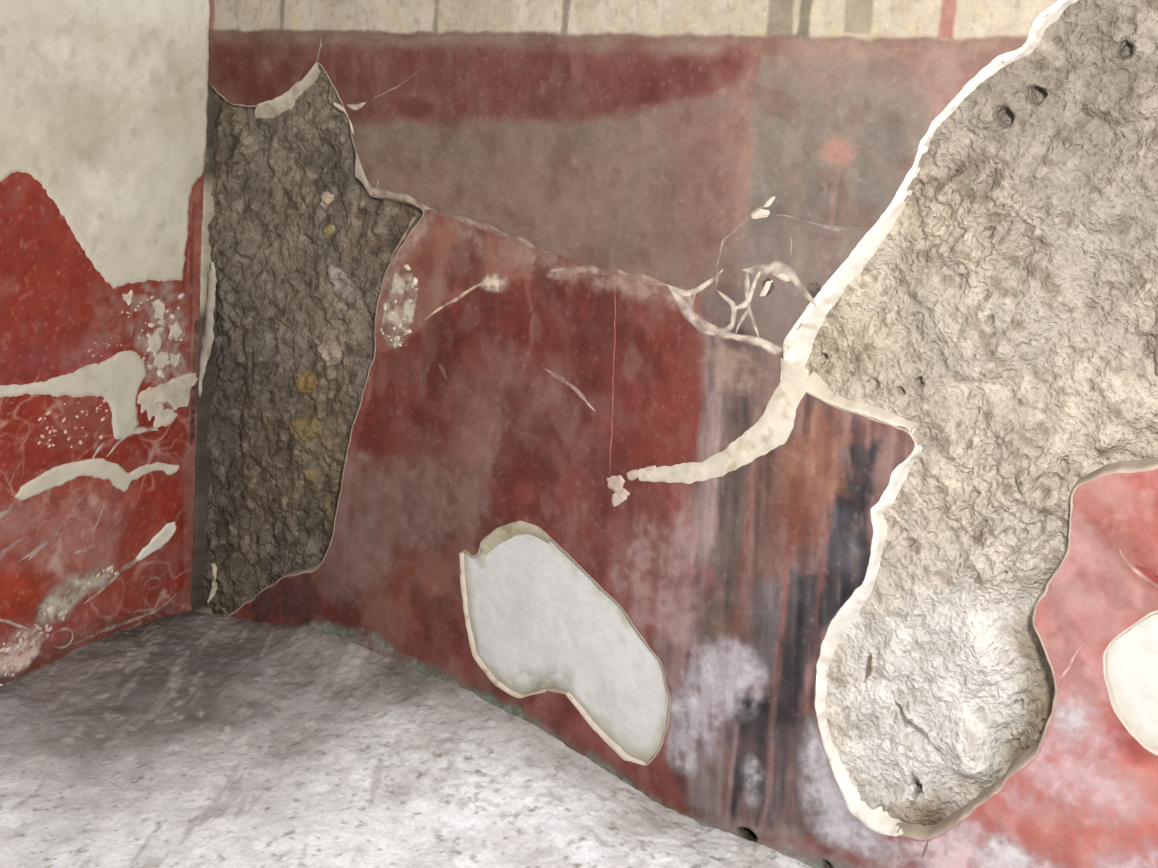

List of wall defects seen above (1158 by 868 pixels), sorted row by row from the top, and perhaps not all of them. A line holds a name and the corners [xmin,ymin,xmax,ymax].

flaking render [121,62,558,616]
crack [607,196,860,507]
peeling [37,400,108,448]
flaking render [549,0,1158,840]
spalling [0,565,120,686]
flaking render [459,520,671,766]
damp [671,642,766,771]
damp [804,739,1052,868]
damp [1028,710,1124,808]
damp [1100,852,1158,868]